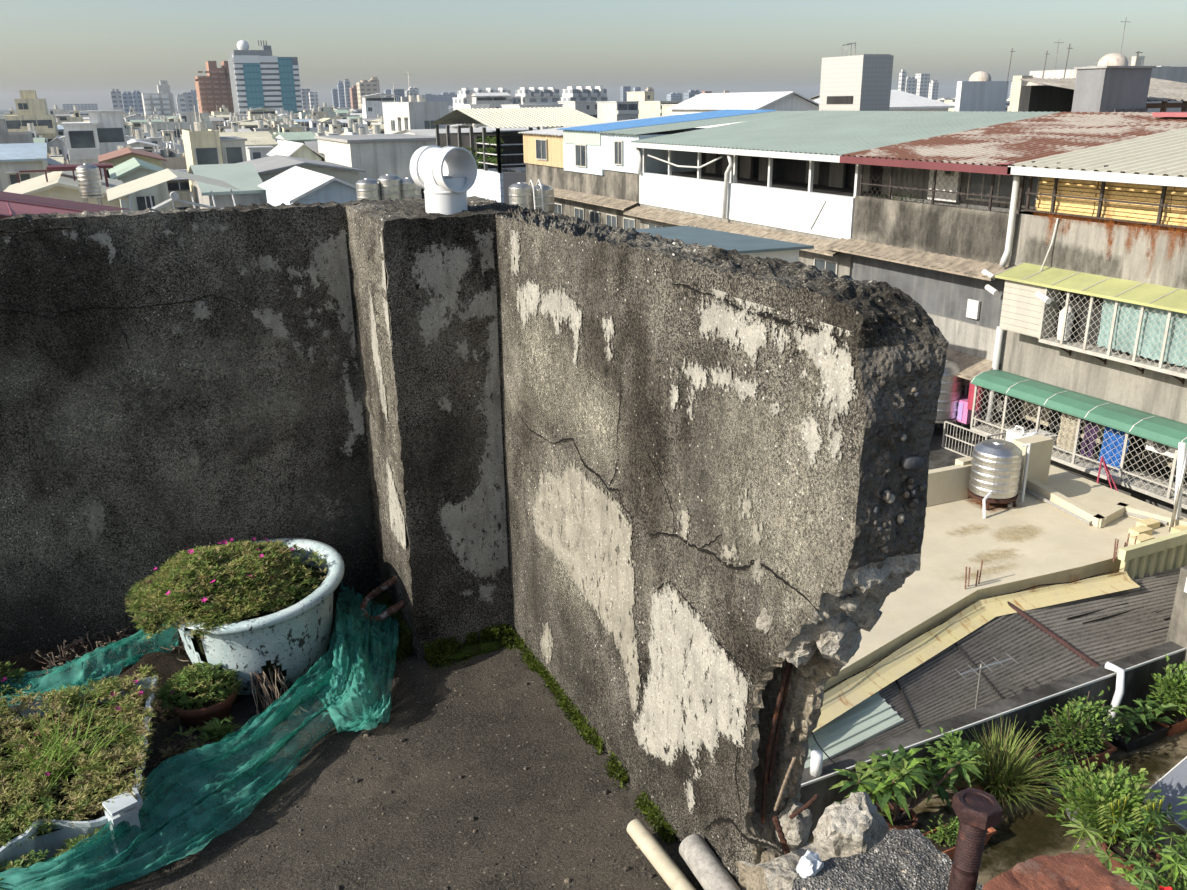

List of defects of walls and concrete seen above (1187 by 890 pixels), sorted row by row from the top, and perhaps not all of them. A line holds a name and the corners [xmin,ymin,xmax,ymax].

crack [0,293,318,350]
peeling [237,230,365,457]
peeling [368,234,391,426]
peeling [386,458,406,553]
peeling [408,228,508,605]
peeling [509,230,582,367]
crack [517,384,820,611]
peeling [719,483,767,586]
peeling [669,289,859,470]
corrosion [1106,222,1184,252]
peeling [532,459,752,814]
spalling [760,584,883,863]